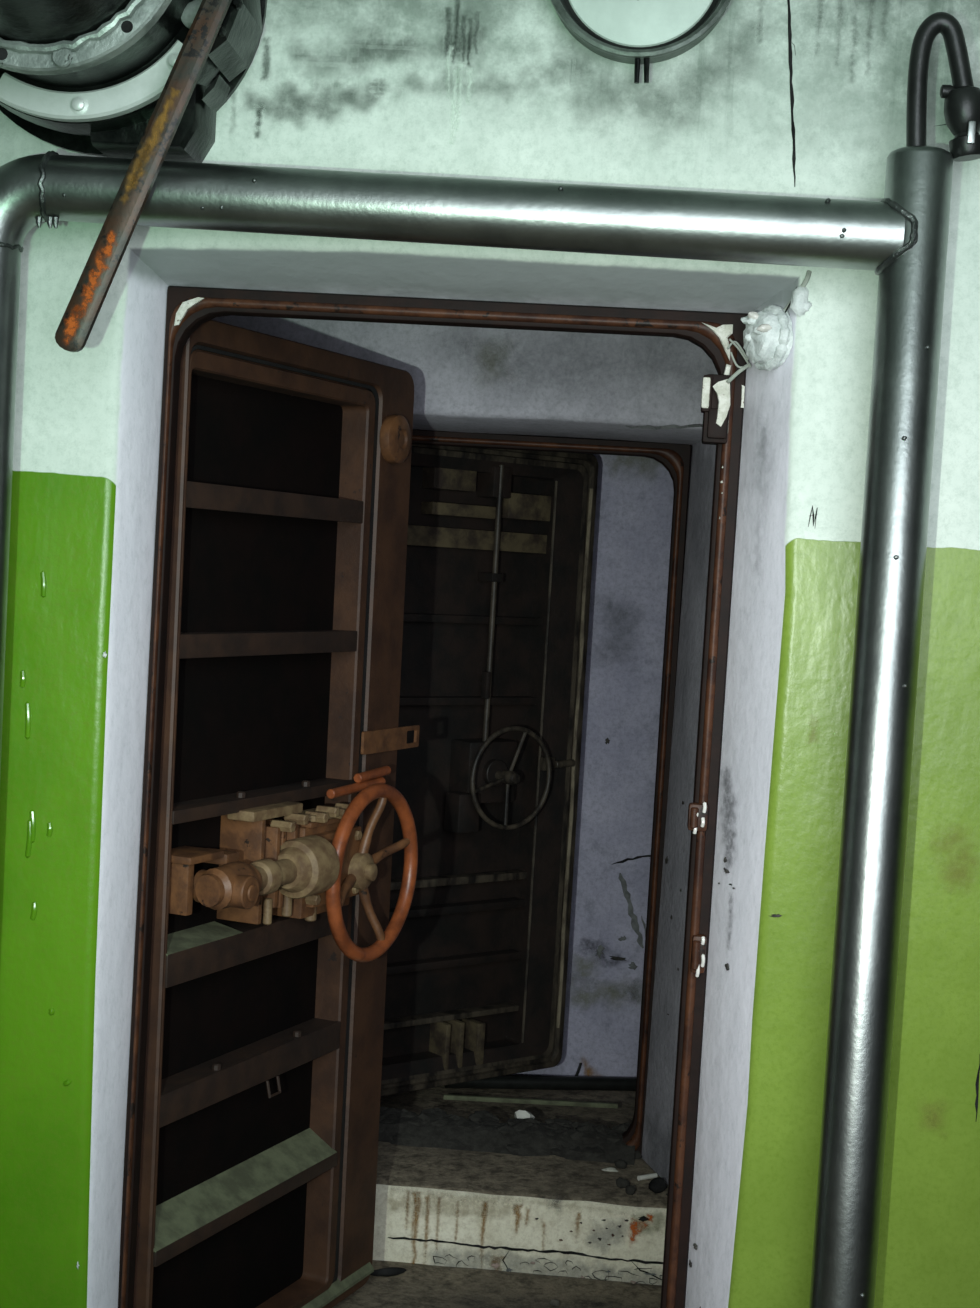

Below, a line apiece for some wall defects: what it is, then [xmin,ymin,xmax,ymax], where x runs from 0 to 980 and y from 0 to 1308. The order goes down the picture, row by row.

crack [787,0,796,187]
crack [613,855,651,864]
rust [406,1192,440,1264]